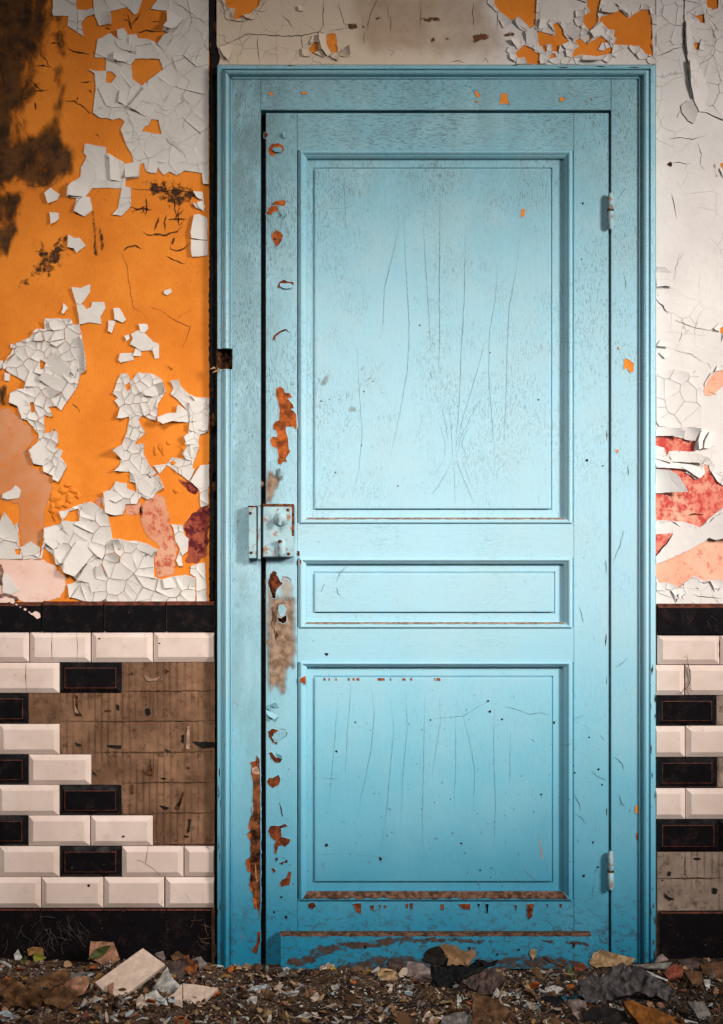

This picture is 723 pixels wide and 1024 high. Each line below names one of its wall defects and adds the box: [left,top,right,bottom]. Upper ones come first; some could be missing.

water stain [0,0,73,255]
peeling [44,0,234,257]
crack [658,4,704,169]
peeling [0,284,210,619]
peeling [267,570,283,599]
peeling [269,386,298,465]
crack [382,225,520,504]
crack [656,299,714,394]
peeling [656,340,723,600]
peeling [29,662,215,844]
peeling [242,728,292,978]
crack [329,689,549,859]